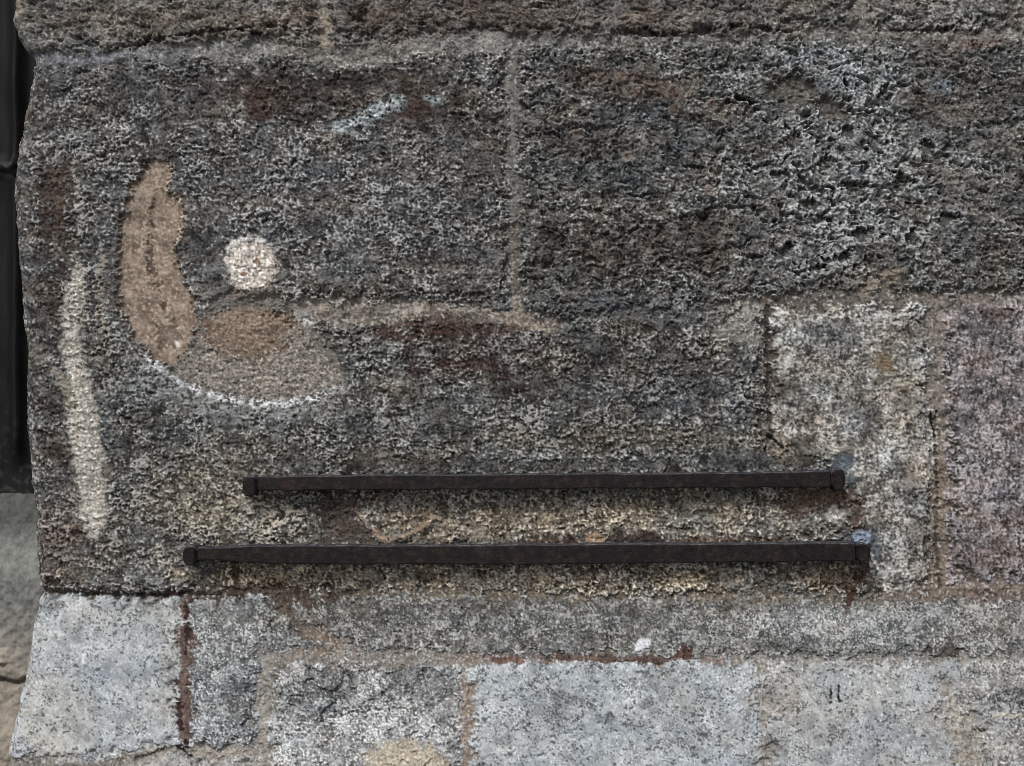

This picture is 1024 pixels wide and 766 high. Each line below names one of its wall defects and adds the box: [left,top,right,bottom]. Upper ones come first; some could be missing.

corrosion [492,654,524,664]
corrosion [556,645,693,665]
corrosion [175,595,194,750]